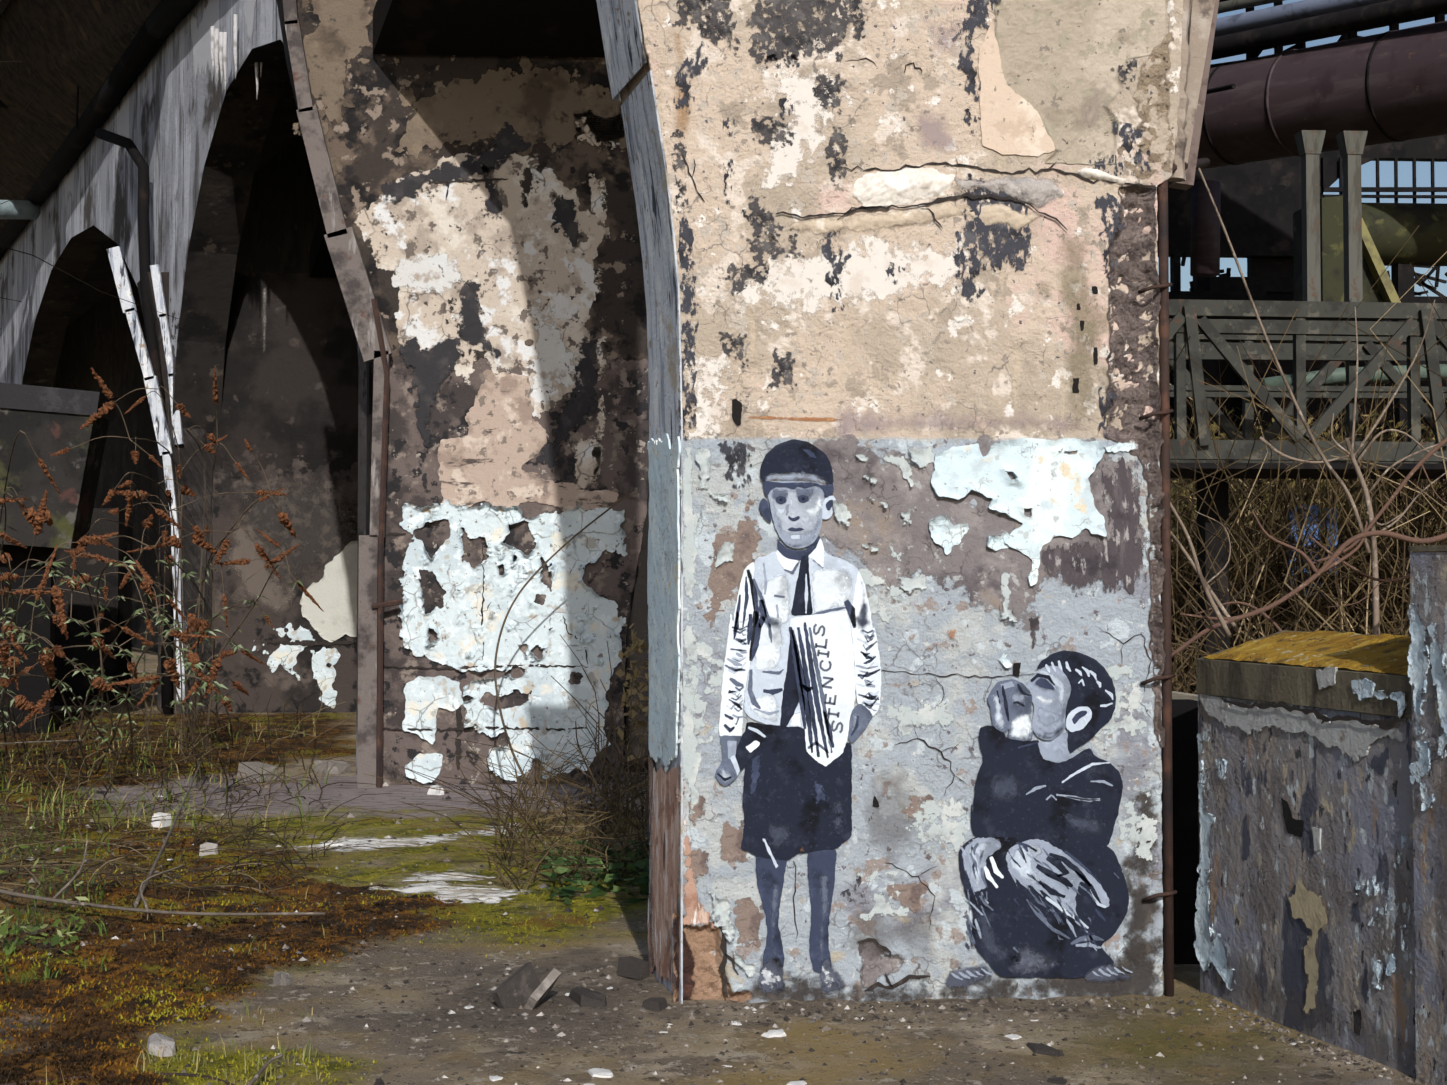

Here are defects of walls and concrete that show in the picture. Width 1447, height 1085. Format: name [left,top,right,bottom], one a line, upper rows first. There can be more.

peeling [672,0,873,186]
peeling [723,160,852,312]
water stain [761,62,853,189]
water stain [720,235,969,316]
crack [776,157,1167,230]
flaking render [354,56,627,784]
water stain [684,348,730,445]
peeling [796,0,1173,748]
peeling [229,515,358,708]
peeling [647,129,764,1003]
peeling [1316,603,1447,811]
peeling [1193,729,1236,990]